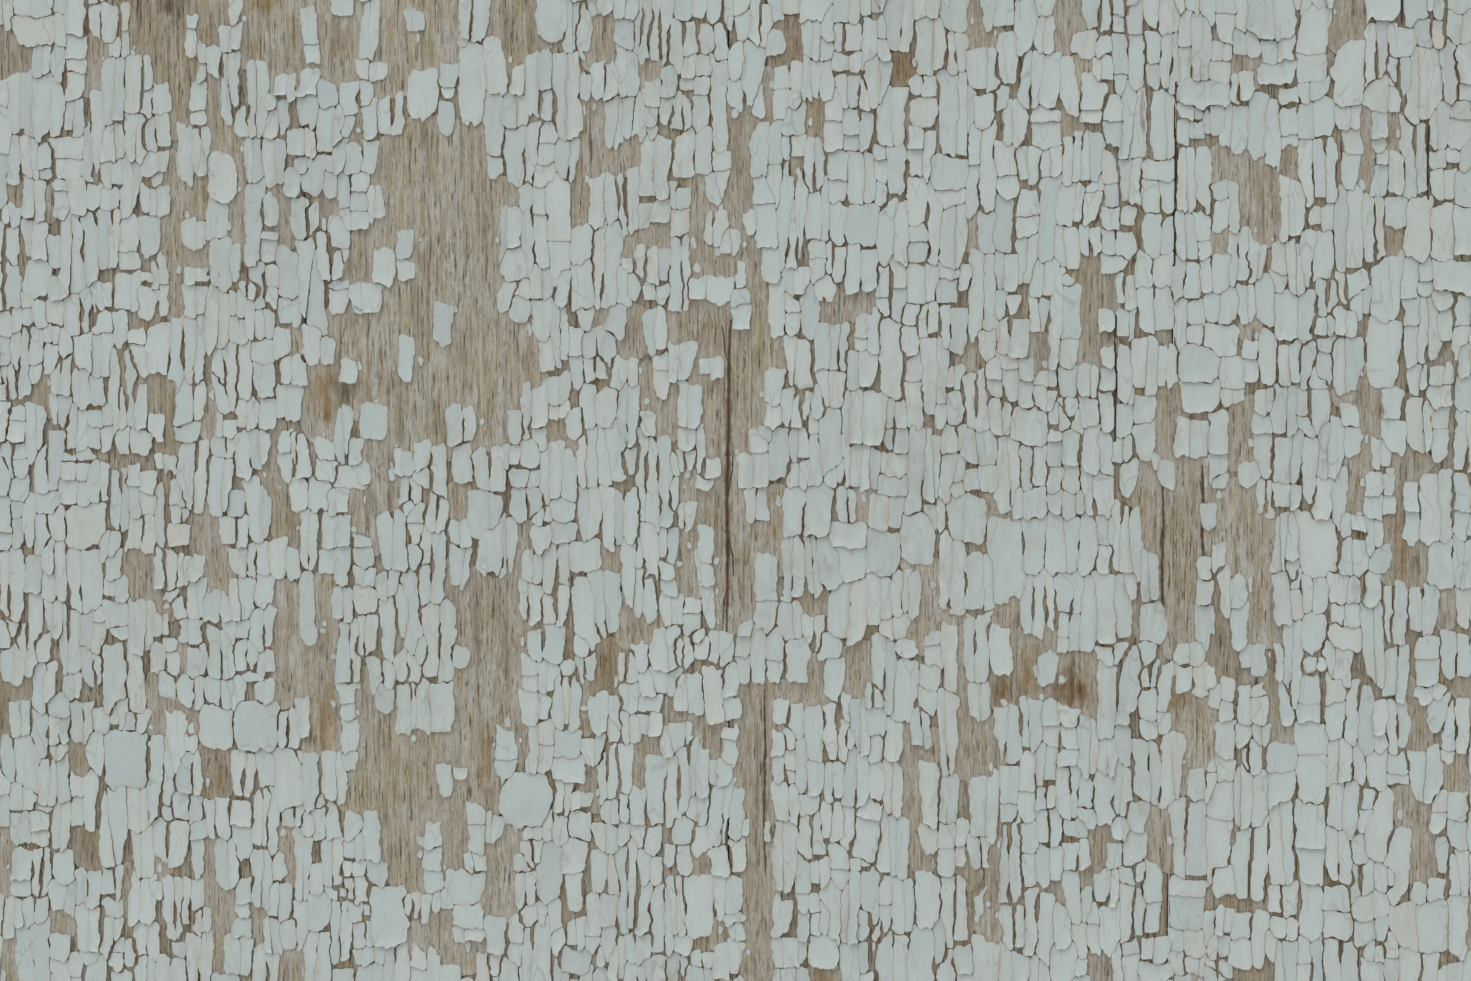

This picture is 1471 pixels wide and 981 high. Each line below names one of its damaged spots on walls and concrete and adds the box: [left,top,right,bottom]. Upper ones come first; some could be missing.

crack [0,0,440,981]
peeling [0,0,890,981]
crack [441,87,455,98]
crack [461,0,1471,981]
peeling [877,0,1471,981]